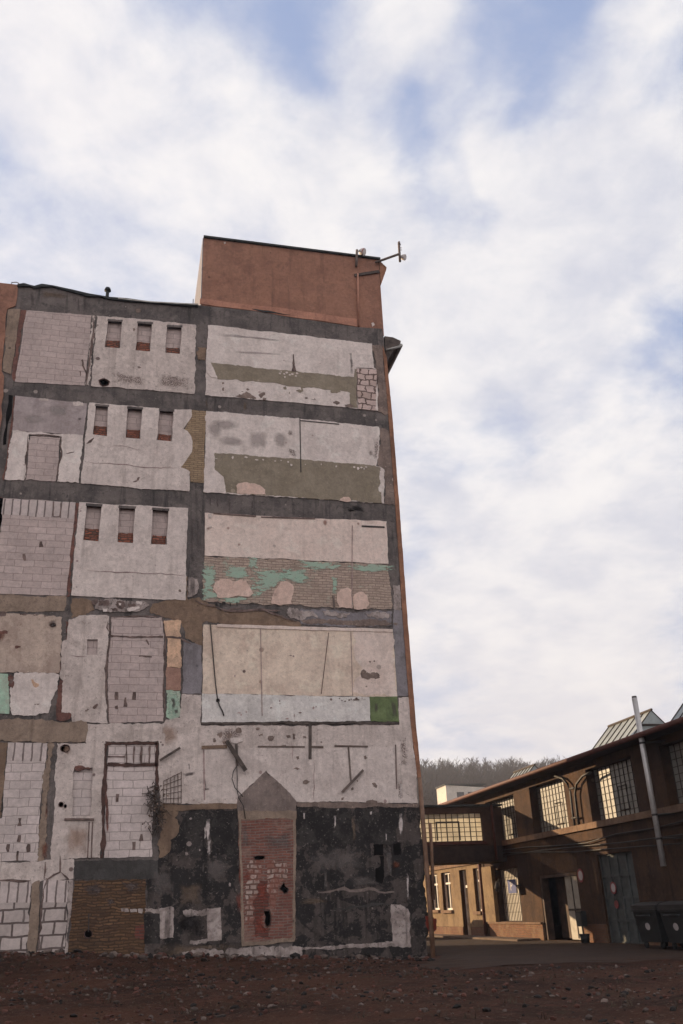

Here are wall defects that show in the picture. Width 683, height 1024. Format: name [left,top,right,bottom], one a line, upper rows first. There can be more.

crack [82,316,95,386]
peeling [236,482,266,495]
peeling [178,557,393,603]
spalling [91,599,142,612]
peeling [287,608,397,627]
spalling [263,909,272,928]